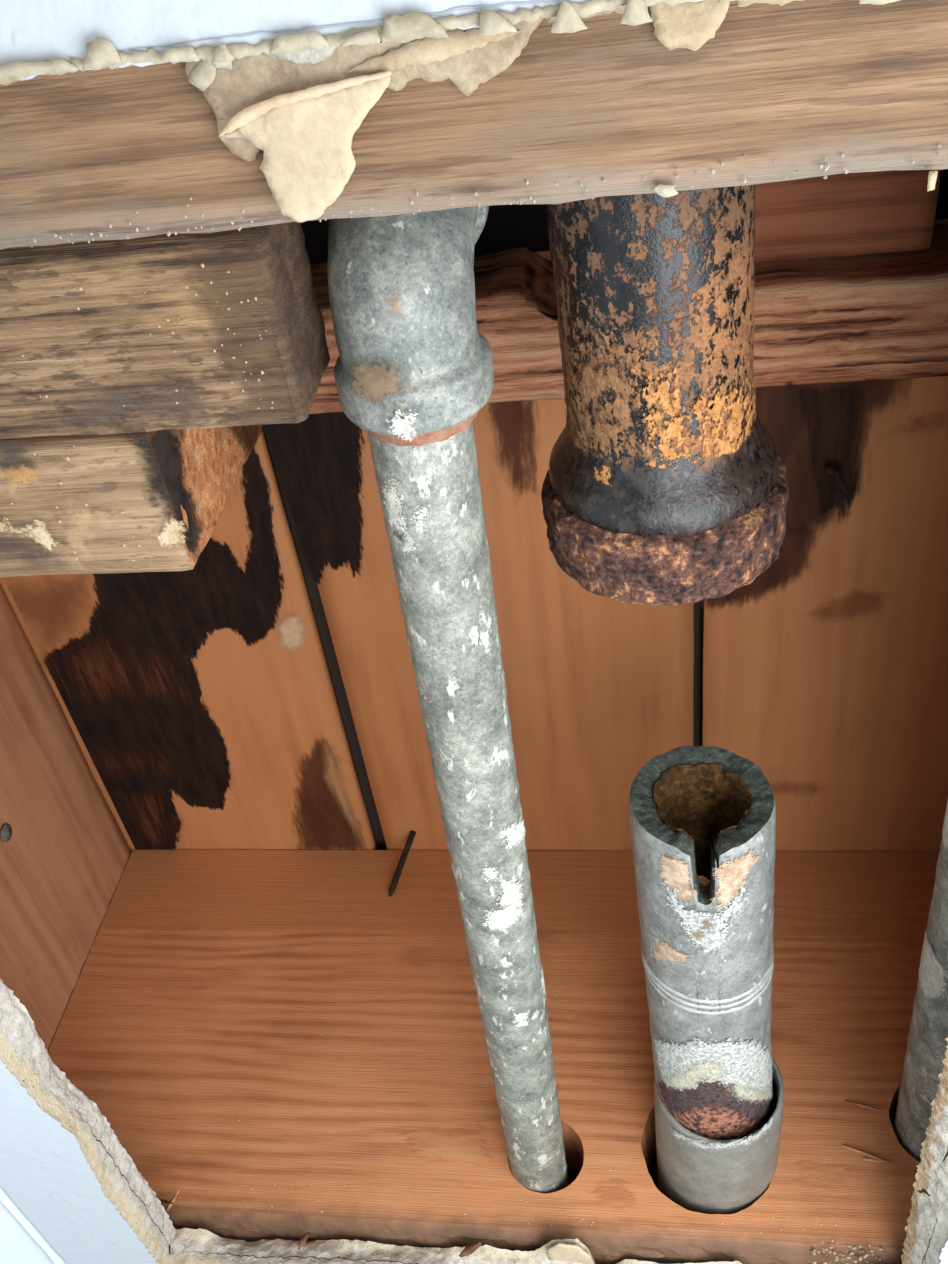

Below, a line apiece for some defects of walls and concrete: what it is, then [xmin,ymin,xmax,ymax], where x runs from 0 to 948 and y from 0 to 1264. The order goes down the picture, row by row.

leakage [350,358,408,406]
leakage [490,401,537,491]
peeling [0,520,58,551]
peeling [151,516,187,548]
peeling [381,478,432,556]
leakage [703,379,900,606]
leakage [44,385,365,850]
peeling [499,817,526,852]
peeling [482,866,523,934]
peeling [658,849,760,910]
spalling [0,978,595,1264]
spalling [901,1038,948,1264]